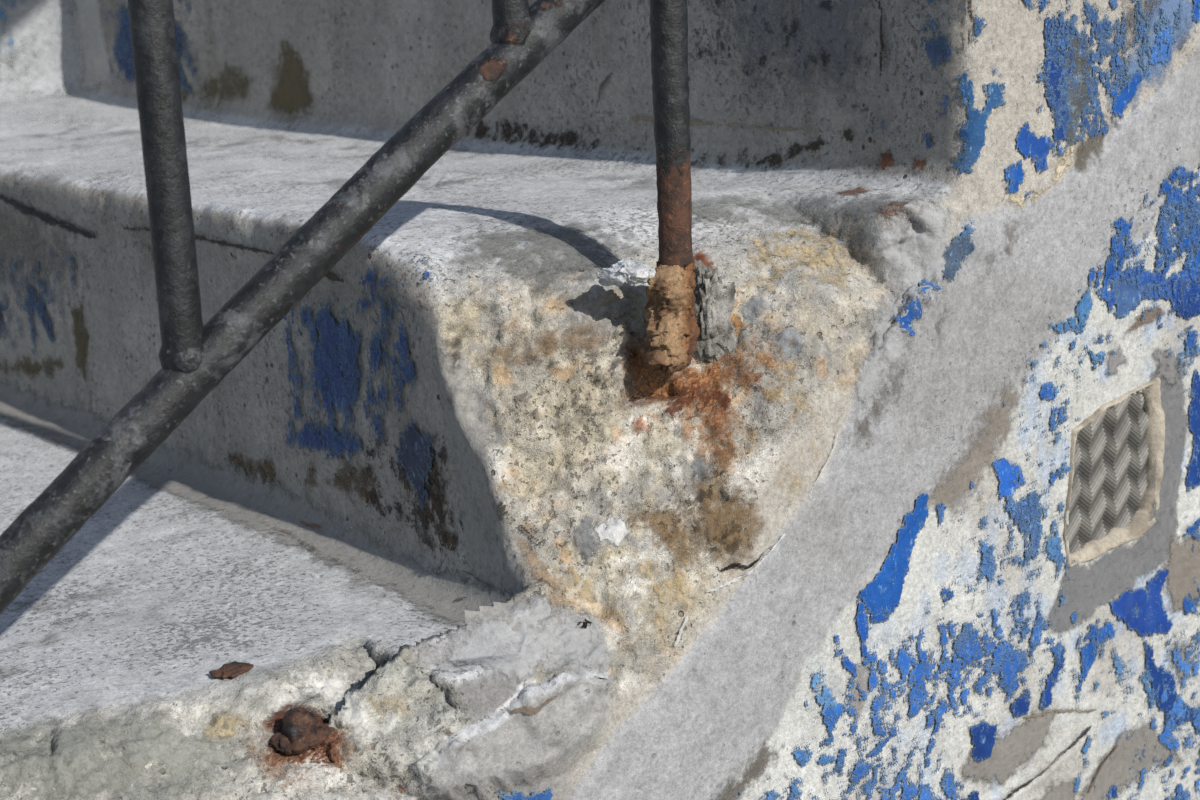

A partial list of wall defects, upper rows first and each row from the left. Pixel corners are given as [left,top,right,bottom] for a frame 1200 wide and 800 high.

peeling [102,0,135,97]
peeling [916,0,1006,178]
peeling [1003,0,1200,200]
peeling [0,226,80,361]
rust [627,253,778,471]
spalling [275,206,976,700]
peeling [760,147,1200,800]
spalling [0,635,553,800]
rust [246,704,355,786]
crack [1005,708,1097,800]
crack [1088,745,1118,793]